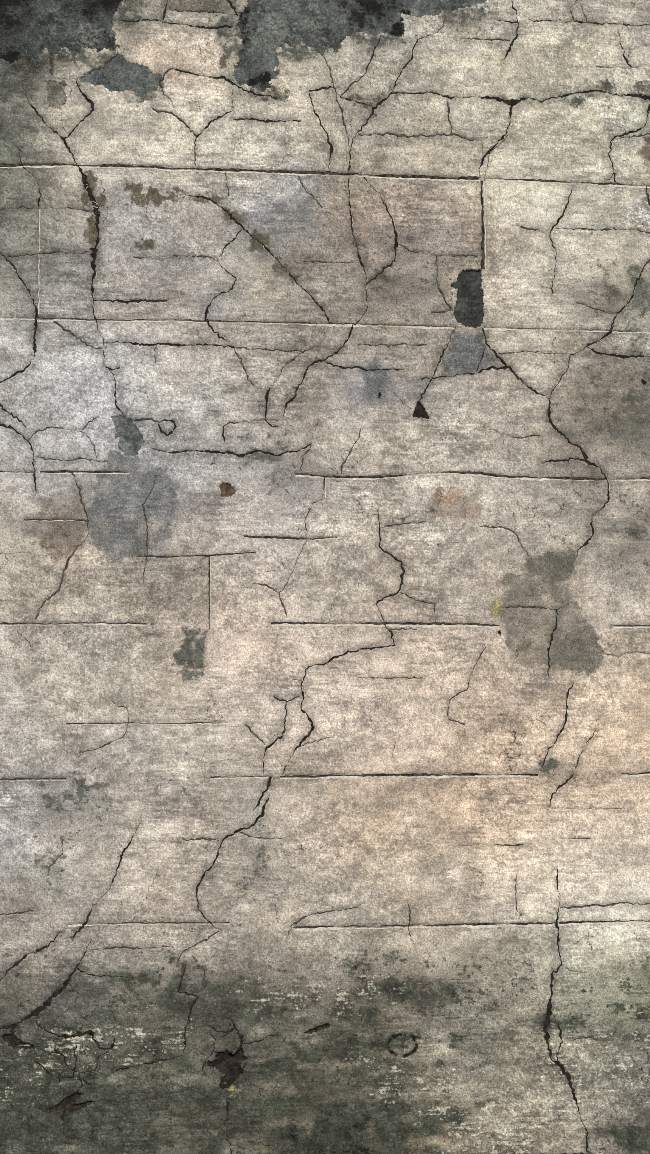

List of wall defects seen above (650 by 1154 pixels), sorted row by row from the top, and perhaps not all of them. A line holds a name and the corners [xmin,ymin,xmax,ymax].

spalling [0,0,164,110]
spalling [232,0,487,92]
crack [0,0,650,646]
peeling [413,402,429,419]
spalling [451,269,484,328]
damp [546,260,650,455]
damp [499,535,604,675]
crack [505,605,595,805]
crack [0,508,436,1154]
damp [0,932,535,1154]
damp [525,978,650,1050]
crack [543,869,650,1154]